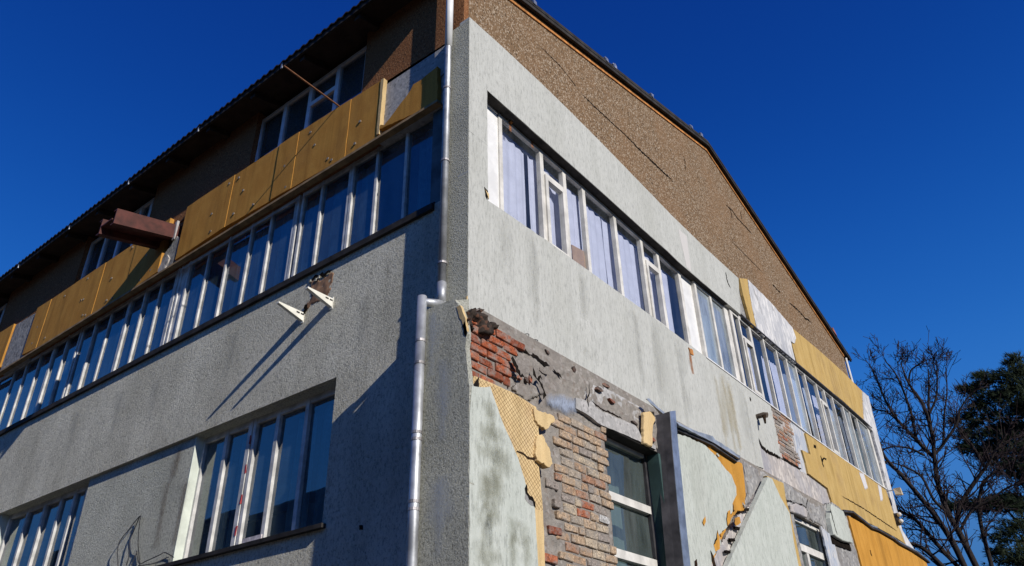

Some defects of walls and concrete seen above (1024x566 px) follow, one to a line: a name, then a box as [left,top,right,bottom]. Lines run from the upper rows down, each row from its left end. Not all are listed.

crack [541,47,686,179]
peeling [516,349,550,383]
peeling [584,383,644,428]
peeling [532,409,555,469]
flaking render [759,407,801,469]
flaking render [525,485,536,507]
flaking render [693,439,860,566]